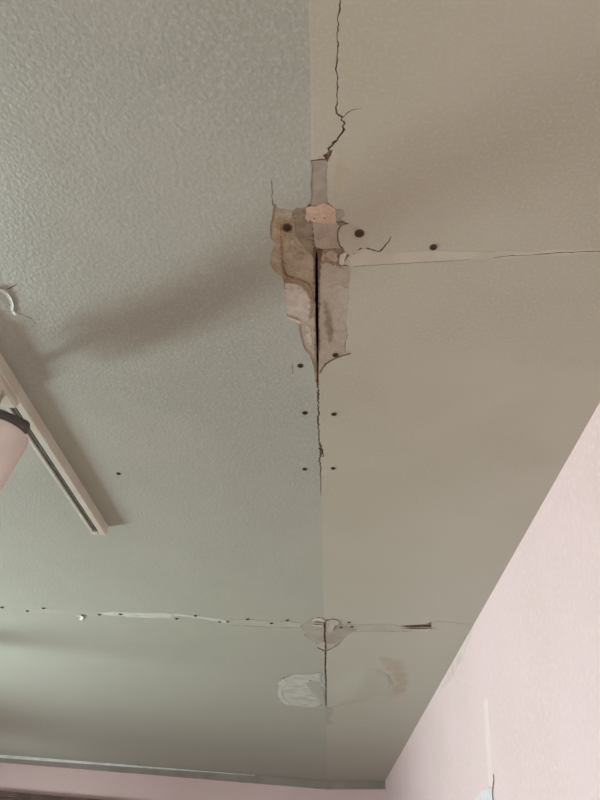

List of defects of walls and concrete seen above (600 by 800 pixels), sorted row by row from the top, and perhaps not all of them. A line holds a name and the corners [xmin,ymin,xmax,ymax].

crack [323,0,362,159]
water stain [282,223,333,372]
spalling [270,150,367,383]
crack [315,252,324,489]
crack [317,622,340,704]
spalling [301,617,437,650]